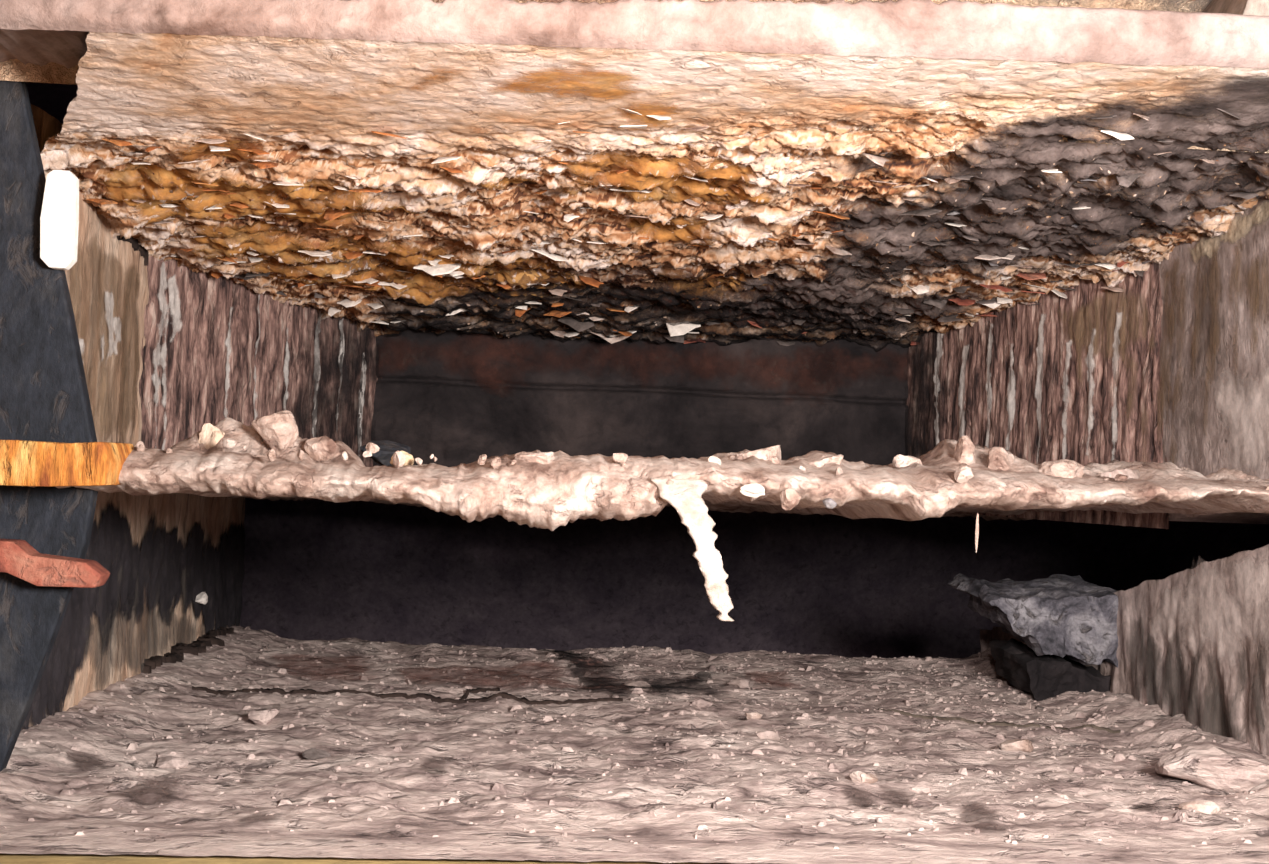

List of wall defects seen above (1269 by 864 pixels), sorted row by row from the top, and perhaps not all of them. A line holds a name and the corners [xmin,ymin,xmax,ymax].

hole [26,82,78,124]
damp [70,241,182,450]
damp [224,308,232,417]
damp [357,353,366,457]
peeling [276,209,512,325]
peeling [515,283,638,344]
peeling [663,321,720,344]
peeling [870,162,1151,323]
damp [1157,245,1269,475]
spalling [240,483,1269,658]
crack [141,627,623,705]
damp [1130,559,1269,737]